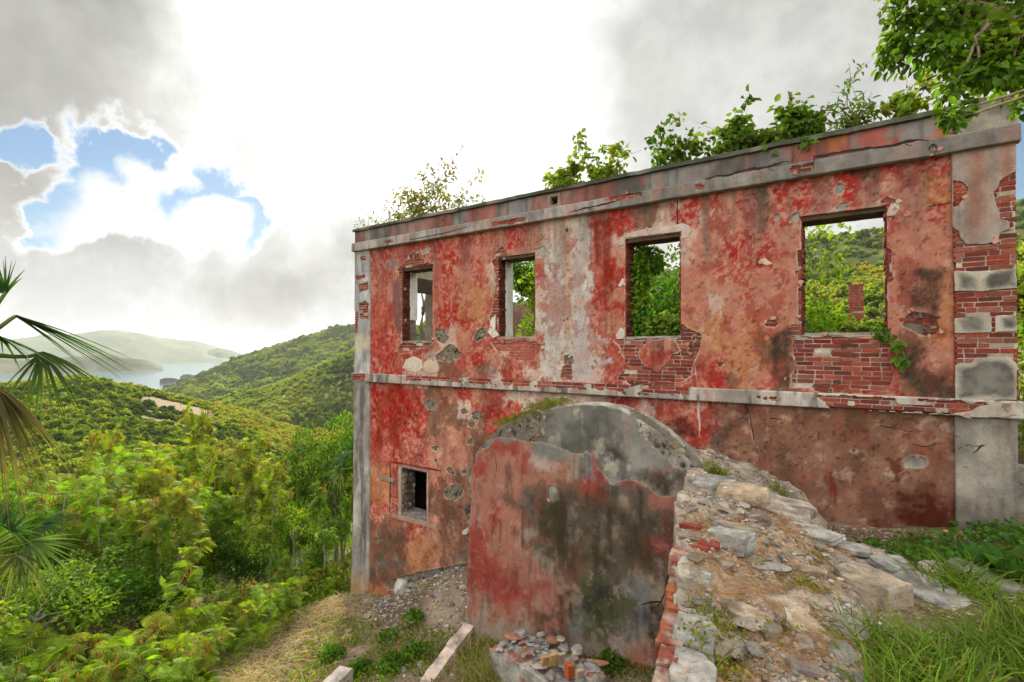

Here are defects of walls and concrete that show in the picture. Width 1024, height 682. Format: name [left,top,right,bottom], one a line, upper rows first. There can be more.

crack [705,139,929,180]
spalling [394,247,461,362]
spalling [764,172,1019,432]
spalling [395,295,705,397]
spalling [461,409,481,445]
crack [745,404,780,456]
spalling [432,446,467,501]
flaking render [905,454,926,468]